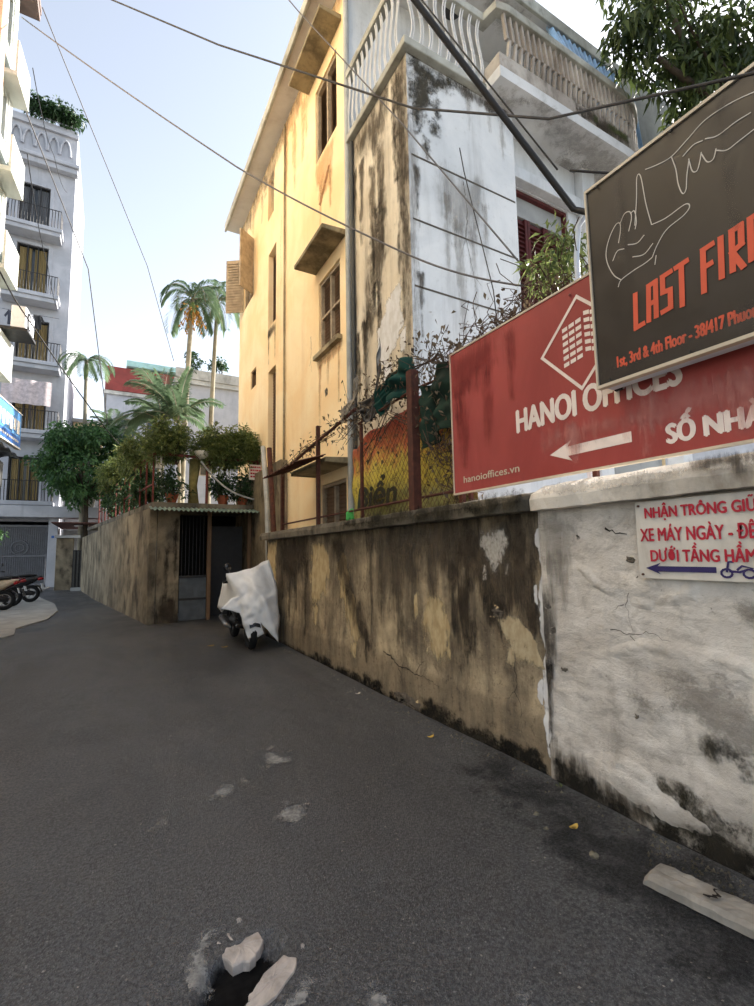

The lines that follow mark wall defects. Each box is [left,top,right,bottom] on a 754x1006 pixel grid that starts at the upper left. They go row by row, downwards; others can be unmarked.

damp [354,83,397,270]
damp [357,283,382,393]
crack [383,651,436,685]
damp [365,524,470,662]
damp [528,596,538,640]
crack [610,576,671,642]
damp [266,633,650,824]
damp [655,825,754,881]